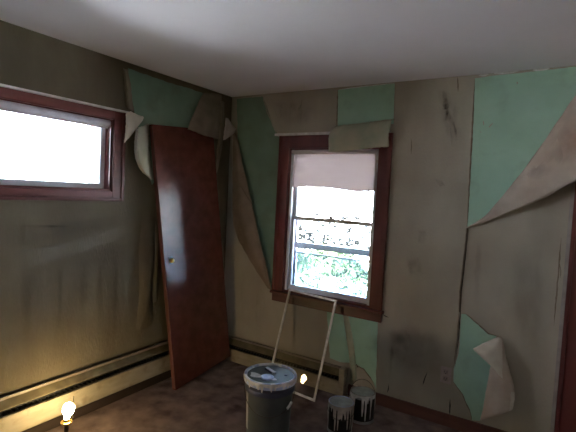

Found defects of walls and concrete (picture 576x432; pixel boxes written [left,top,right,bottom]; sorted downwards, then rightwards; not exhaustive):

flaking render [128,68,203,184]
flaking render [237,96,279,290]
flaking render [467,66,576,227]
flaking render [327,312,378,388]
flaking render [453,314,497,421]